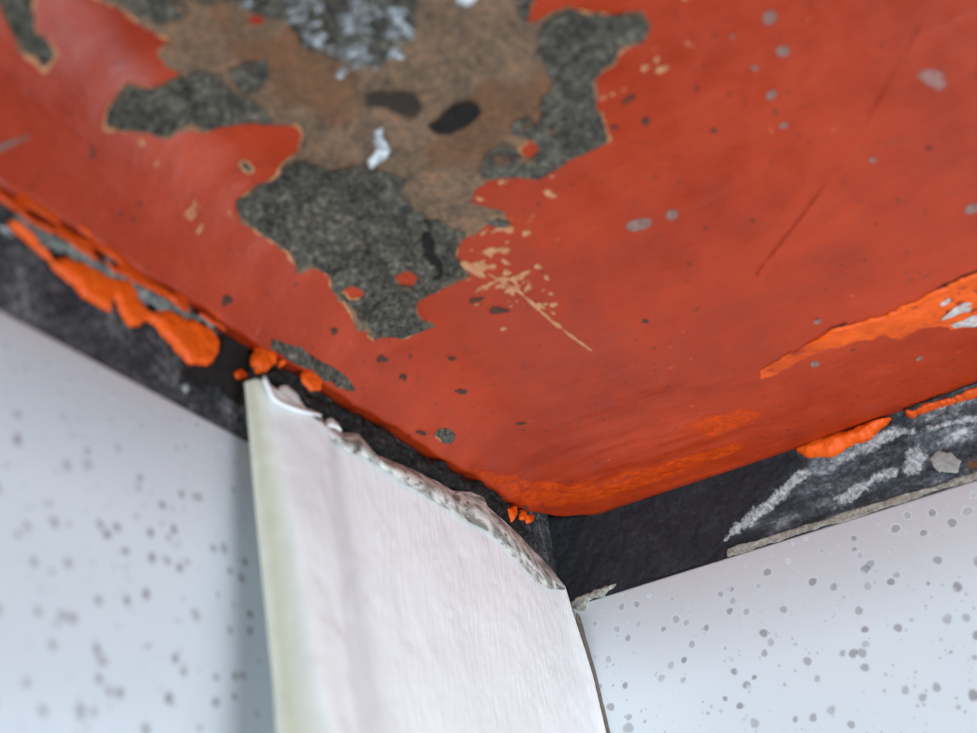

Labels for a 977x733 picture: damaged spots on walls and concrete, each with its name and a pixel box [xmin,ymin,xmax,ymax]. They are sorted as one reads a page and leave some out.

peeling [0,0,58,74]
peeling [98,0,652,341]
peeling [0,189,249,405]
spalling [760,270,977,379]
peeling [415,428,455,444]
peeling [480,444,740,510]
water stain [838,427,915,462]
water stain [834,445,927,503]
water stain [930,416,977,430]
water stain [547,449,811,601]